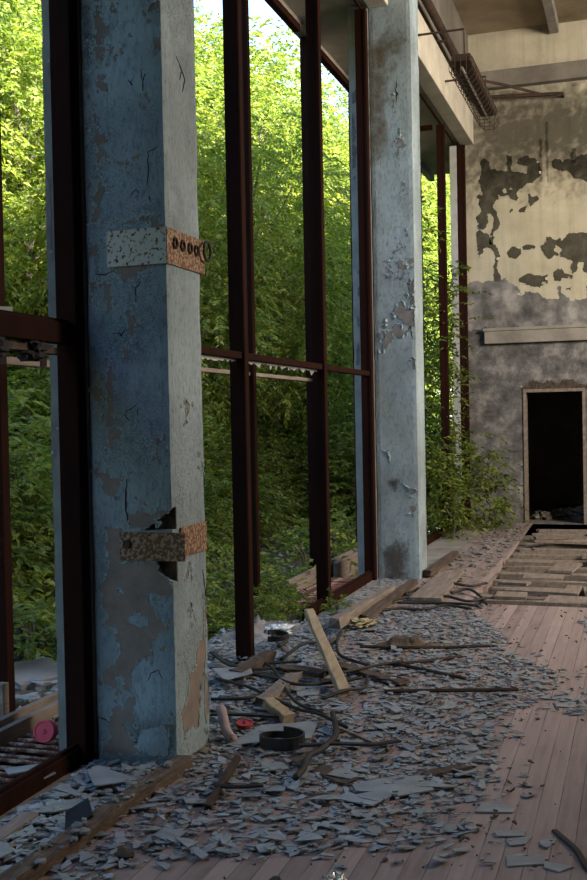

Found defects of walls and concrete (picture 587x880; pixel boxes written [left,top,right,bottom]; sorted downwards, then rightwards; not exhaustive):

peeling [84,0,143,257]
peeling [139,0,160,23]
peeling [151,37,161,56]
flaking render [467,154,587,331]
crack [124,472,132,525]
peeling [93,496,194,759]